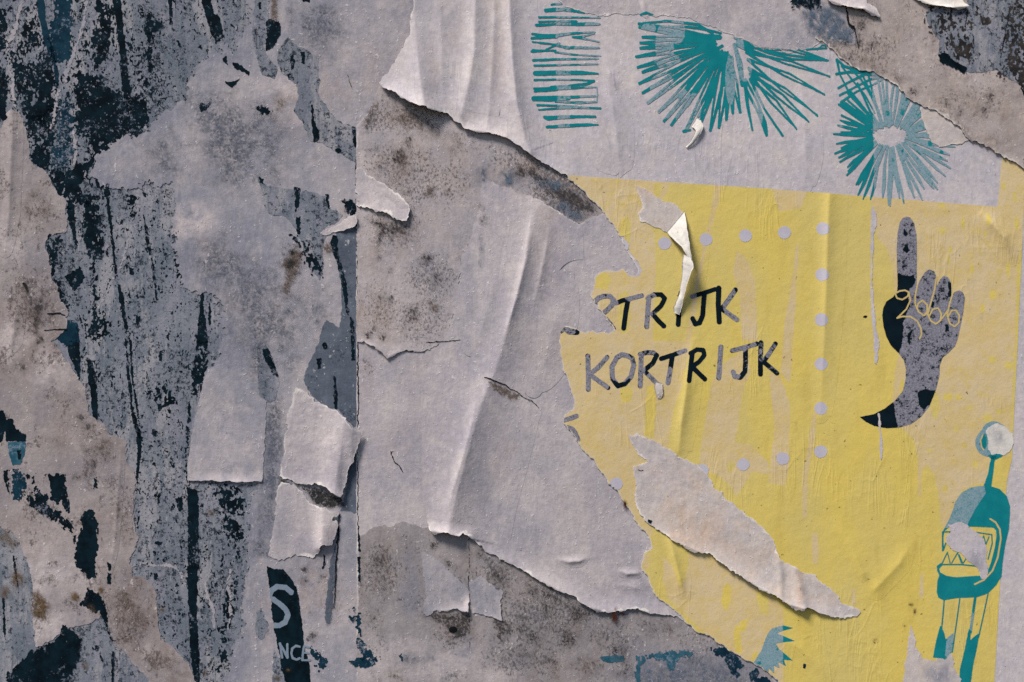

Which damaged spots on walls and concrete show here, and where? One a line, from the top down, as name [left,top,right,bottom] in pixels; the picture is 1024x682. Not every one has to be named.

damp [311,104,319,142]
peeling [379,69,585,188]
peeling [815,33,1024,168]
peeling [926,0,1024,84]
damp [323,85,603,360]
peeling [325,453,357,624]
peeling [628,433,863,619]